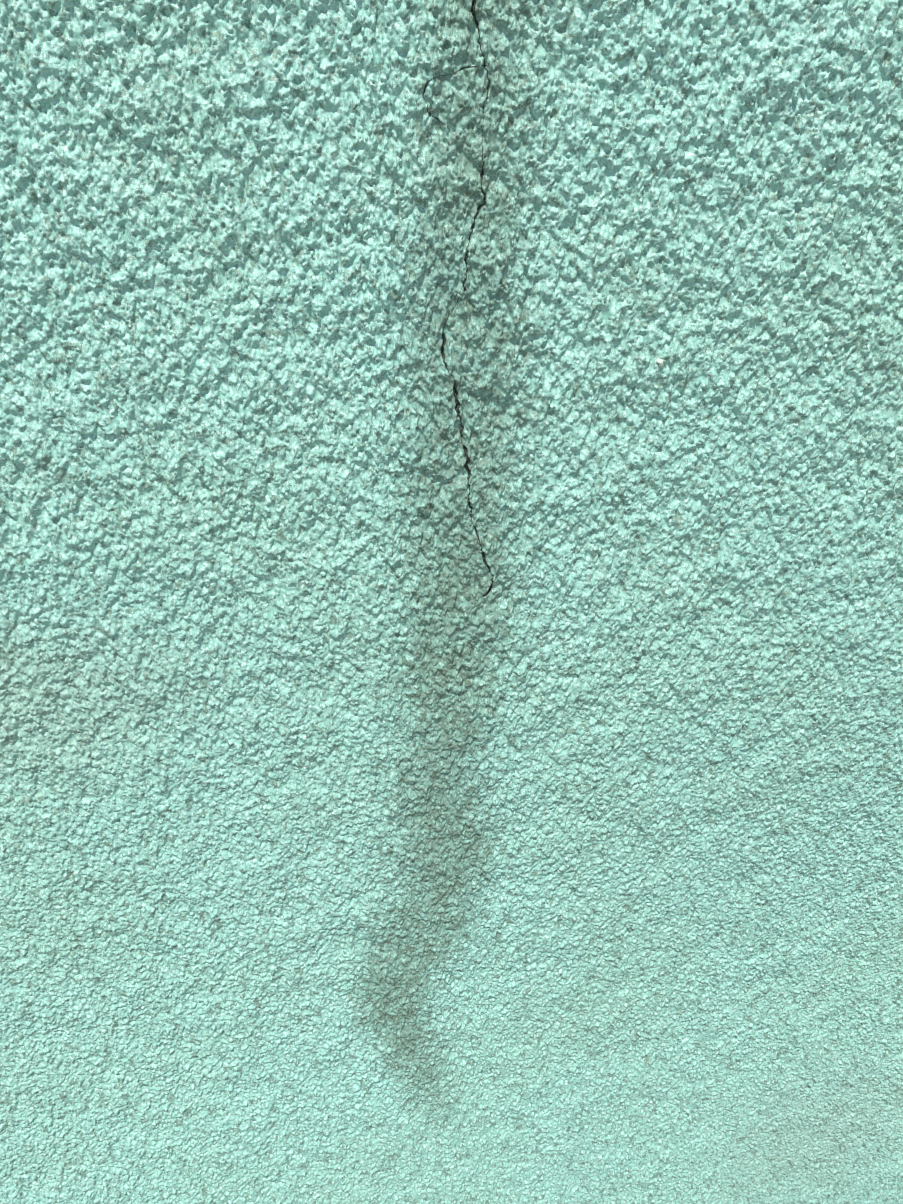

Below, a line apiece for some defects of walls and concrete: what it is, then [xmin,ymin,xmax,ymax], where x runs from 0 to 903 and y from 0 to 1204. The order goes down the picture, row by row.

crack [423,0,498,597]